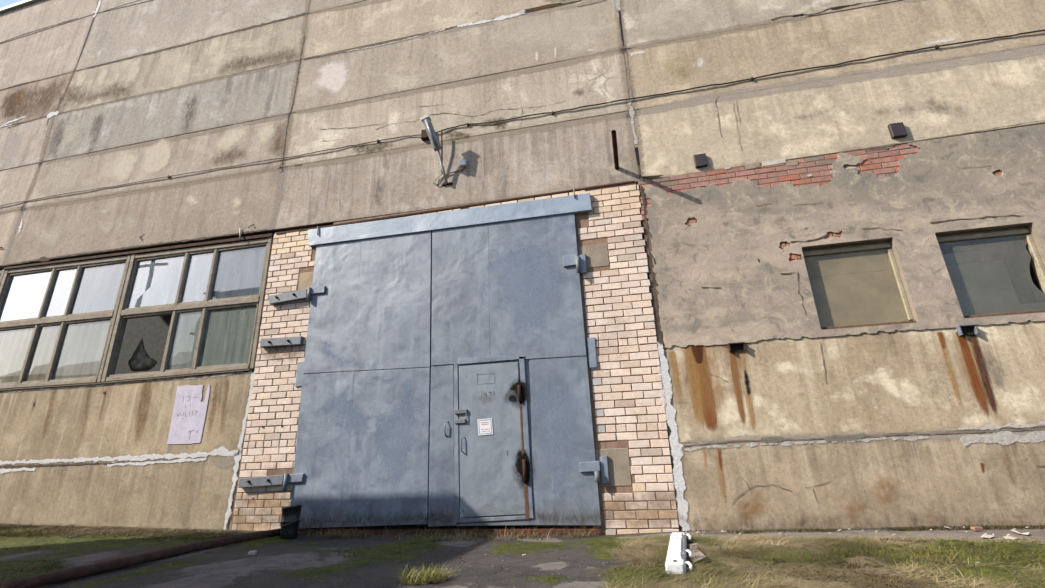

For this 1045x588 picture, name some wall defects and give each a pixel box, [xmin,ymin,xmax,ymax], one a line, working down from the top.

damp [5,84,125,116]
crack [324,100,565,141]
flaking render [638,144,920,221]
flaking render [779,242,801,262]
corrosion [670,345,717,429]
corrosion [730,351,754,426]
corrosion [938,332,960,400]
corrosion [956,332,996,413]